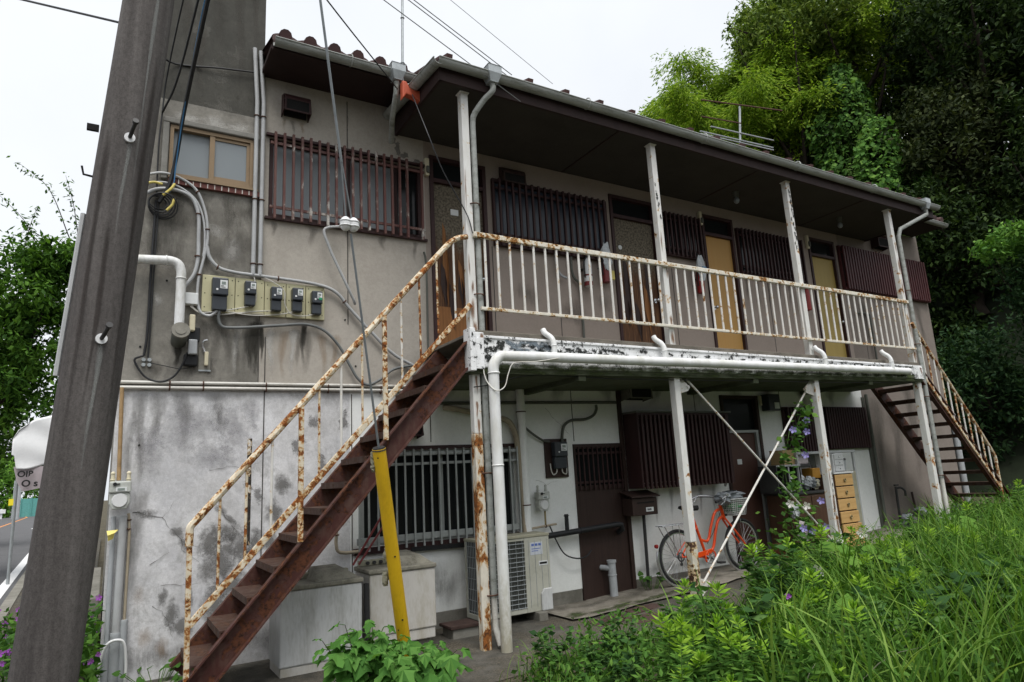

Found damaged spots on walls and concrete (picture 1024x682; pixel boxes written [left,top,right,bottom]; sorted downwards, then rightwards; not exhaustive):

water stain [291,325,307,360]
peeling [471,332,651,362]
crack [133,505,197,636]
water stain [200,507,275,620]
water stain [159,589,184,634]